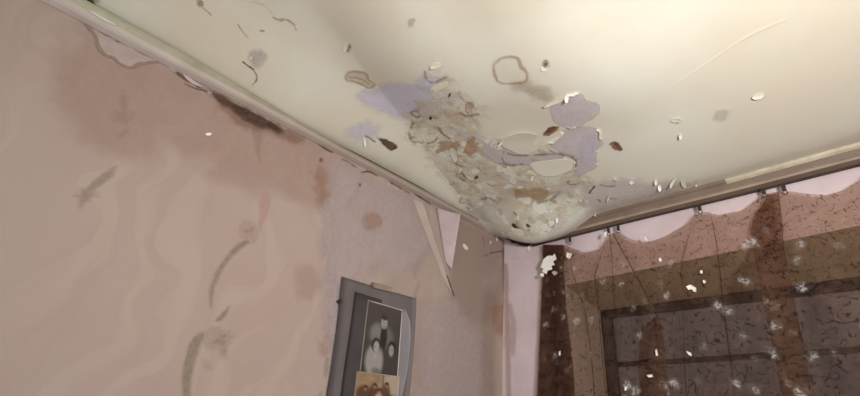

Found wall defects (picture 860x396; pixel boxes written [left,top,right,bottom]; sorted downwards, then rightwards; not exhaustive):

water stain [83,23,158,68]
water stain [215,94,282,132]
peeling [360,63,617,244]